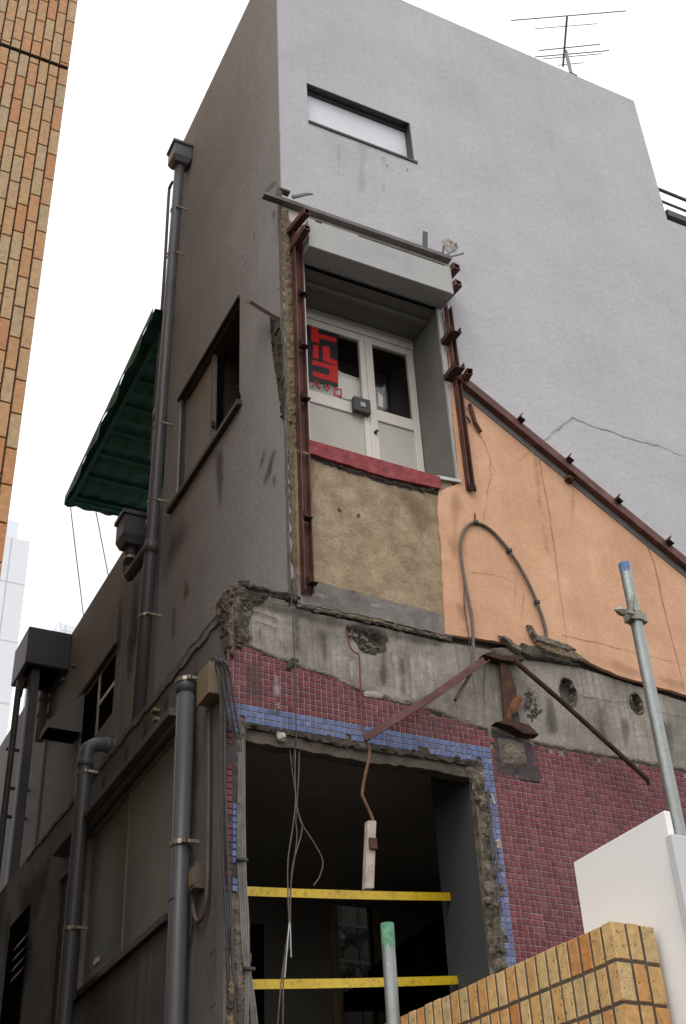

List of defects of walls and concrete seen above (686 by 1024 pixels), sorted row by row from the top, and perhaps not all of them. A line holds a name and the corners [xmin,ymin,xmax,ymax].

peeling [270,219,297,448]
crack [539,417,684,689]
spalling [215,579,488,731]
peeling [491,625,590,666]
spalling [484,829,505,904]